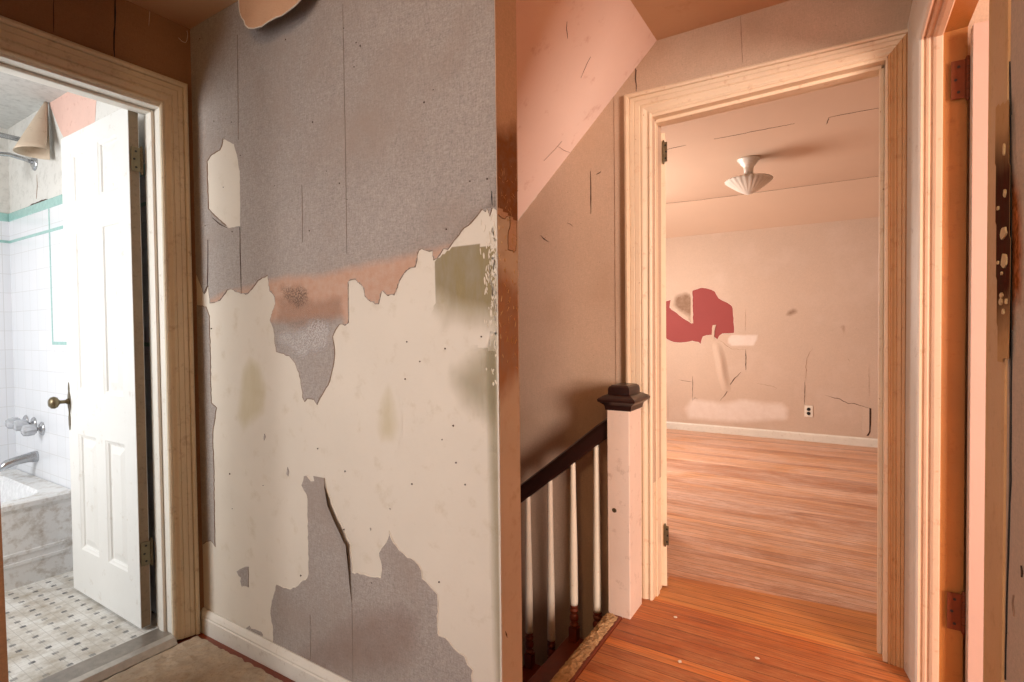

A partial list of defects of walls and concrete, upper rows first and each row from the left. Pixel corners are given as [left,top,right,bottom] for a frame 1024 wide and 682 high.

damp [210,210,498,386]
corrosion [1011,113,1024,331]
crack [804,351,871,436]
peeling [237,567,249,587]